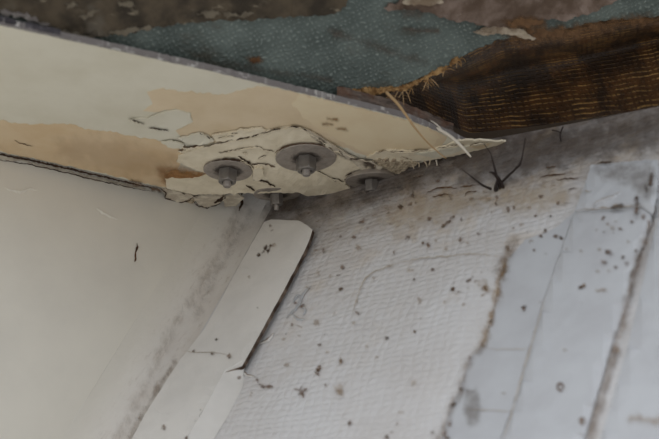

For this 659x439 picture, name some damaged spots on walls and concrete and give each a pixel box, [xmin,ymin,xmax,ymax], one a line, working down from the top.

peeling [384,0,617,40]
crack [0,126,342,211]
rust [161,169,205,182]
peeling [0,86,506,207]